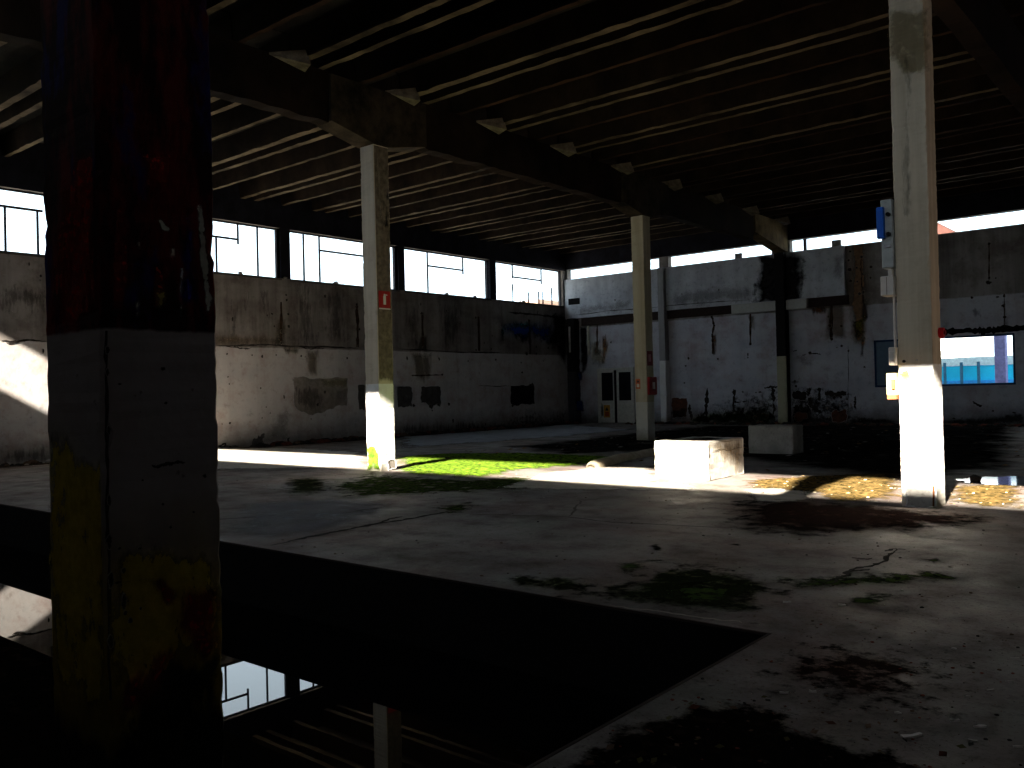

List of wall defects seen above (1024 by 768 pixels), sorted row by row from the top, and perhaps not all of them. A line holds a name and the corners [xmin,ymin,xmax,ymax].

flaking render [283,376,365,420]
crack [804,549,906,584]